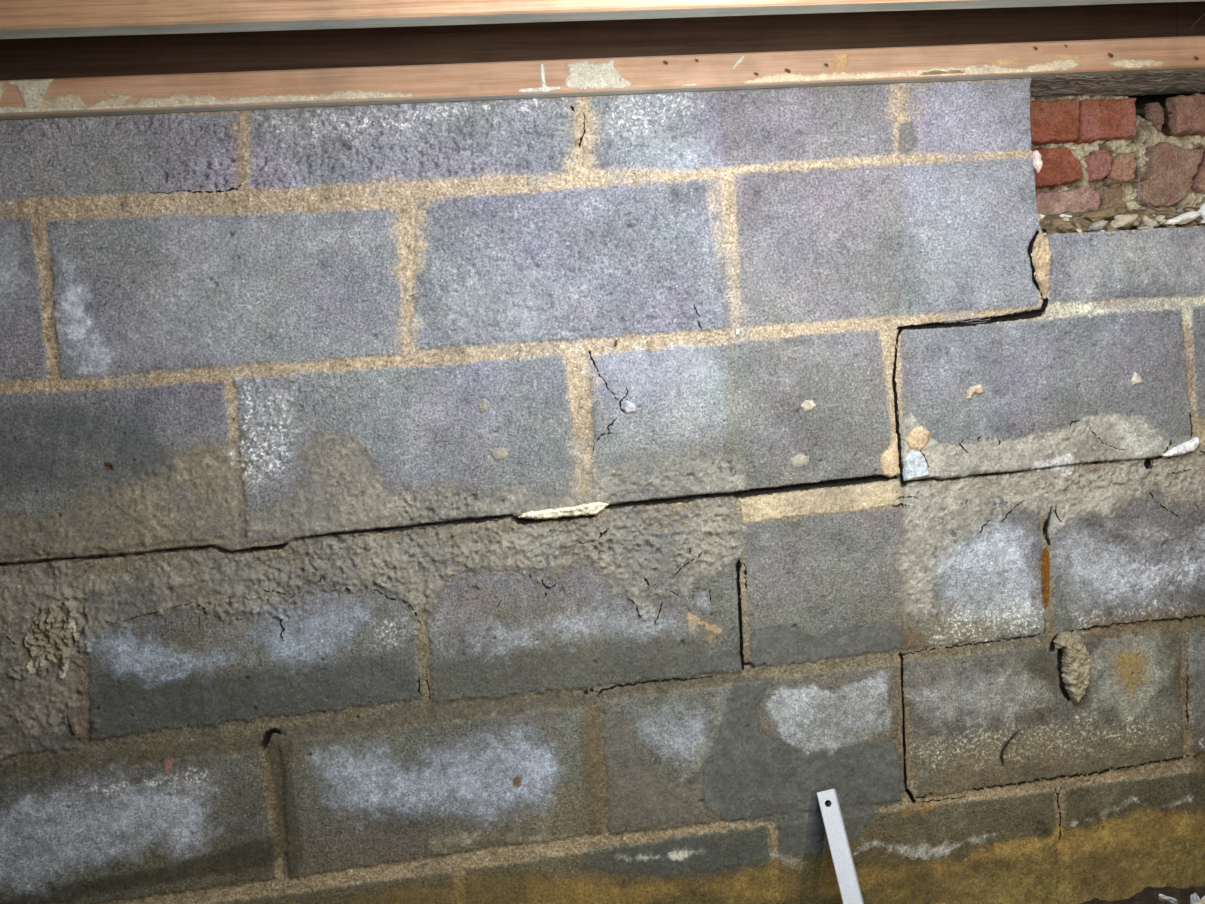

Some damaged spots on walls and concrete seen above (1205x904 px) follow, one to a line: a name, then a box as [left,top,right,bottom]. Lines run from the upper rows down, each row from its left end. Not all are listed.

spalling [1118,92,1205,137]
crack [0,229,1205,578]
spalling [902,451,929,481]
leakage [87,606,415,738]
crack [262,577,421,640]
crack [584,676,713,696]
crack [628,548,755,670]
leakage [433,526,1044,879]
rust [1042,548,1050,606]
crack [899,615,1205,841]
leakage [919,533,1205,770]
leakage [0,738,302,904]